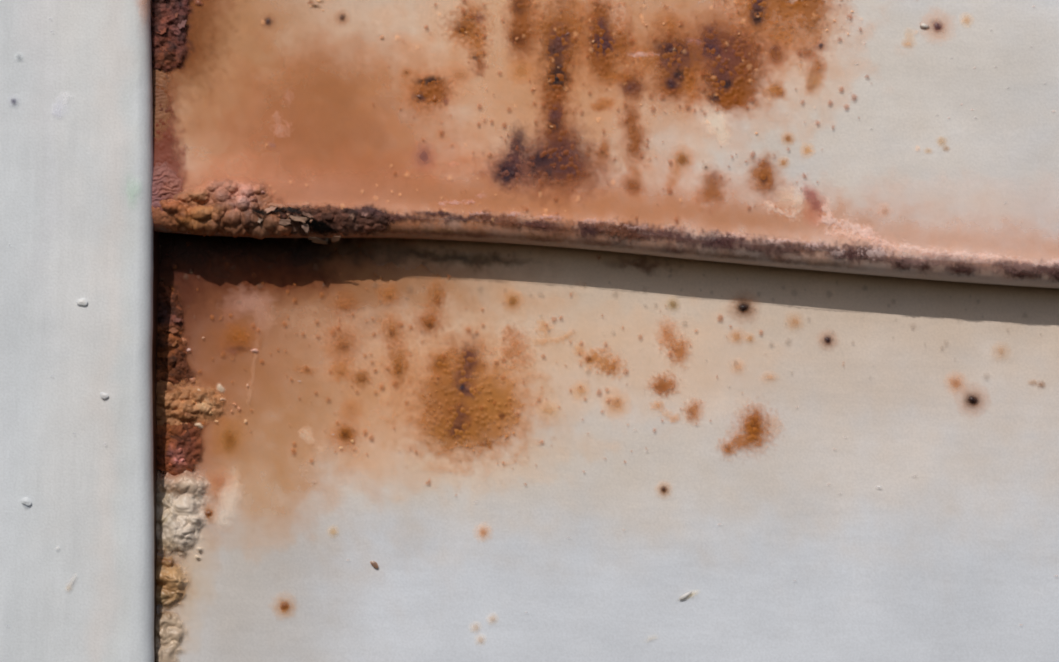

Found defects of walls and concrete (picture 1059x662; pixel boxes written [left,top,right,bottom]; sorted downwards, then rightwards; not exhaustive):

rust [151,0,211,215]
rust [213,0,1059,280]
rust [156,280,194,385]
rust [156,421,204,476]
rust [418,347,523,454]
rust [724,409,769,452]
rust [965,393,979,406]